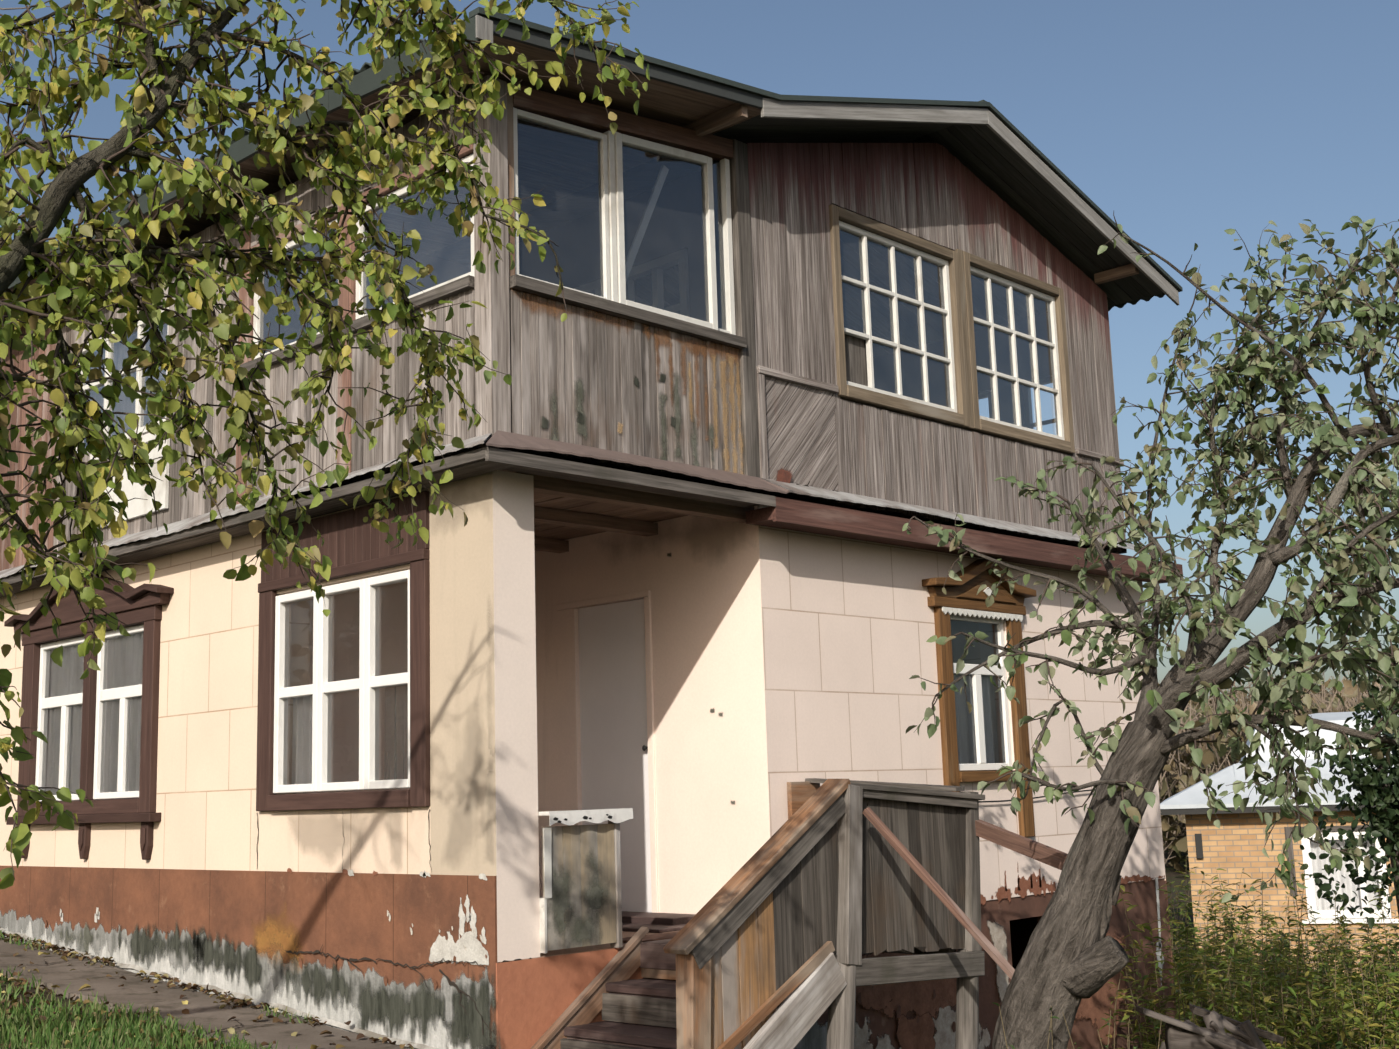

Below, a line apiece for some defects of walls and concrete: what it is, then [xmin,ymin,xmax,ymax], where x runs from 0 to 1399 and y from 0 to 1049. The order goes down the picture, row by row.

damp [60,923,93,952]
peeling [0,895,495,1049]
damp [118,921,501,1049]
peeling [855,978,957,1049]
peeling [987,921,1010,1001]
peeling [1074,968,1133,1045]